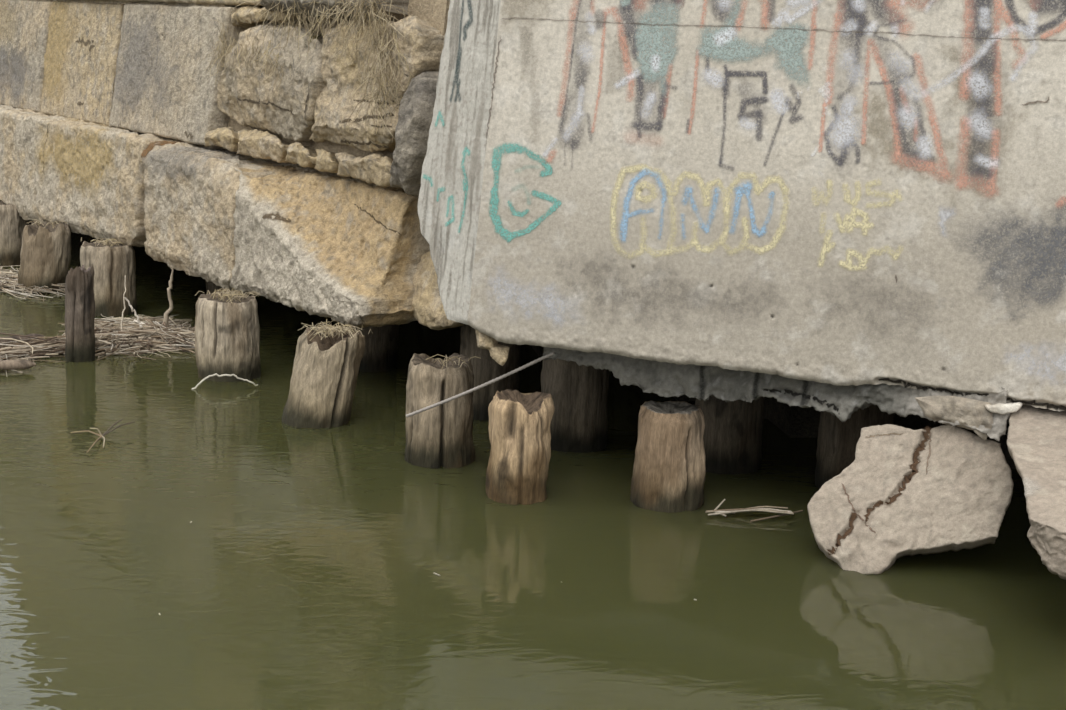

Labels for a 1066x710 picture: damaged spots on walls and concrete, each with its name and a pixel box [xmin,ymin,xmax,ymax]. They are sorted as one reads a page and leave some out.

spalling [915,396,1023,440]